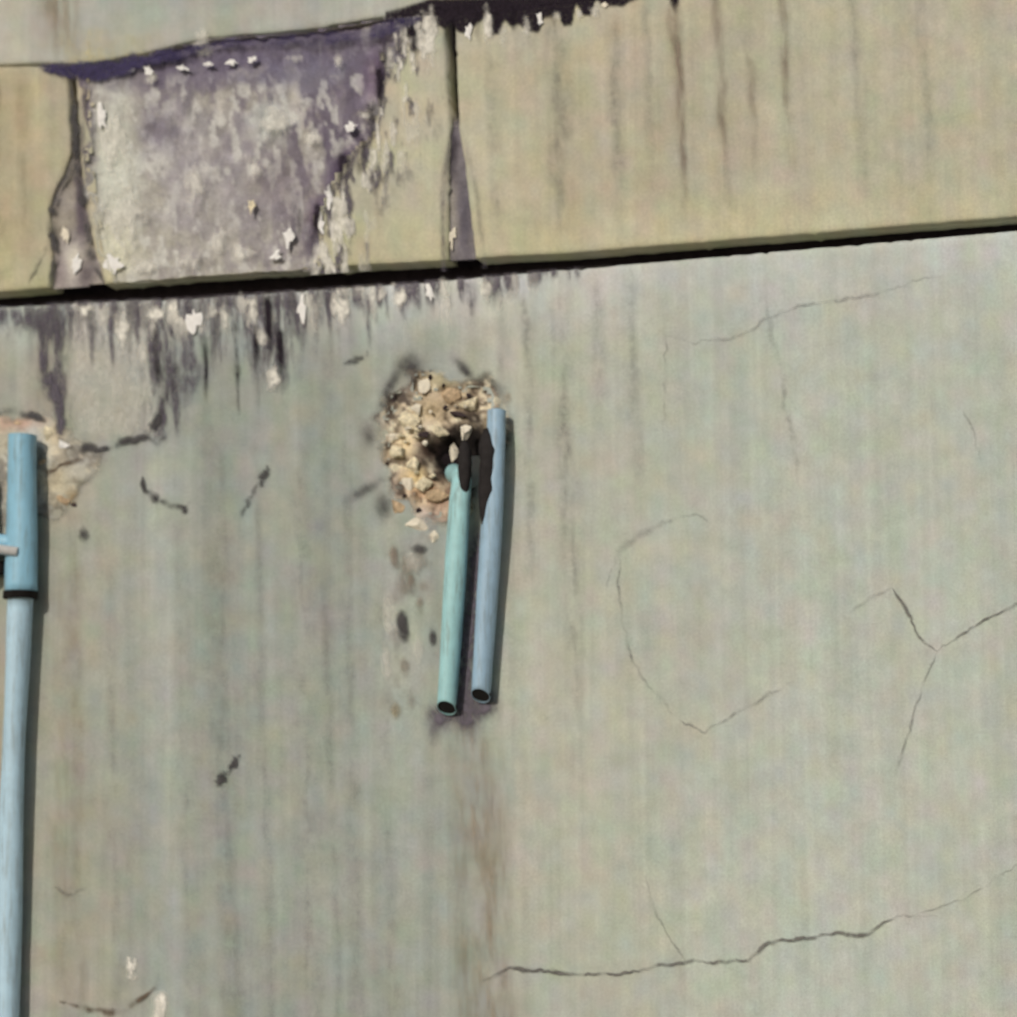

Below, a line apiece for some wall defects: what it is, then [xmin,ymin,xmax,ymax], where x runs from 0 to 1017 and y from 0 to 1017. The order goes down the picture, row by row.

spalling [40,0,631,289]
peeling [482,270,556,294]
peeling [0,278,464,525]
spalling [374,359,499,561]
peeling [397,612,408,640]
crack [894,591,923,641]
crack [498,920,889,976]